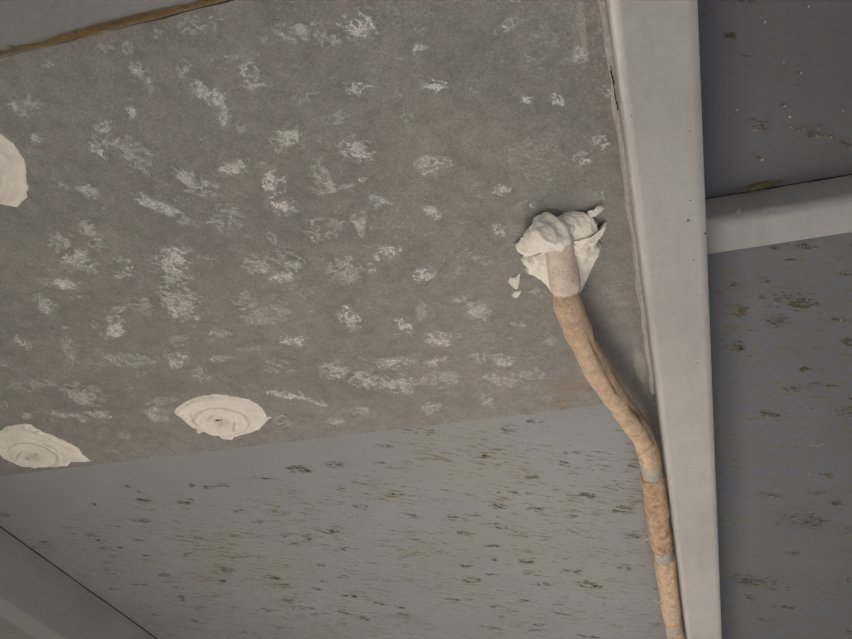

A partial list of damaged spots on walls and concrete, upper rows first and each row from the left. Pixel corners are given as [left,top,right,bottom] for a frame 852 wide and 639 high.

water stain [281,10,377,43]
water stain [195,80,227,126]
water stain [272,127,300,151]
water stain [338,140,373,161]
water stain [219,160,247,175]
water stain [262,163,298,217]
water stain [135,192,183,222]
water stain [245,254,301,283]
water stain [155,246,199,322]
water stain [104,306,128,339]
water stain [321,364,412,394]
water stain [266,387,326,406]